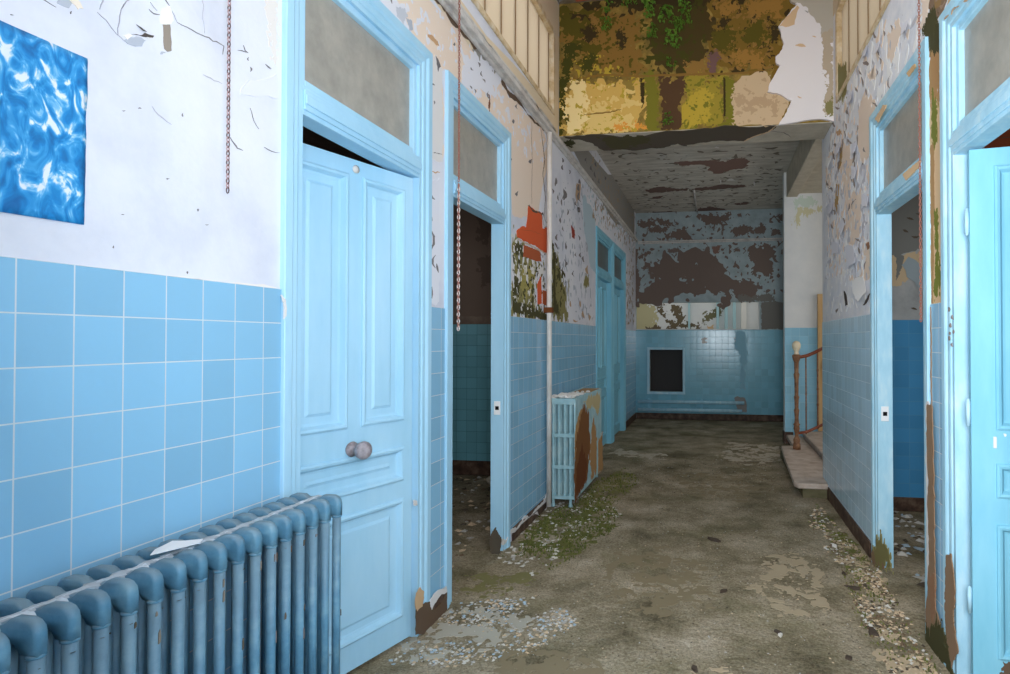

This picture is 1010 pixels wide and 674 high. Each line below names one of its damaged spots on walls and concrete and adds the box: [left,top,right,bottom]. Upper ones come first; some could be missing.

crack [97,0,270,69]
crack [230,108,278,153]
flaking render [380,0,930,330]
damp [559,0,780,136]
peeling [891,102,955,347]
flaking render [415,586,447,635]